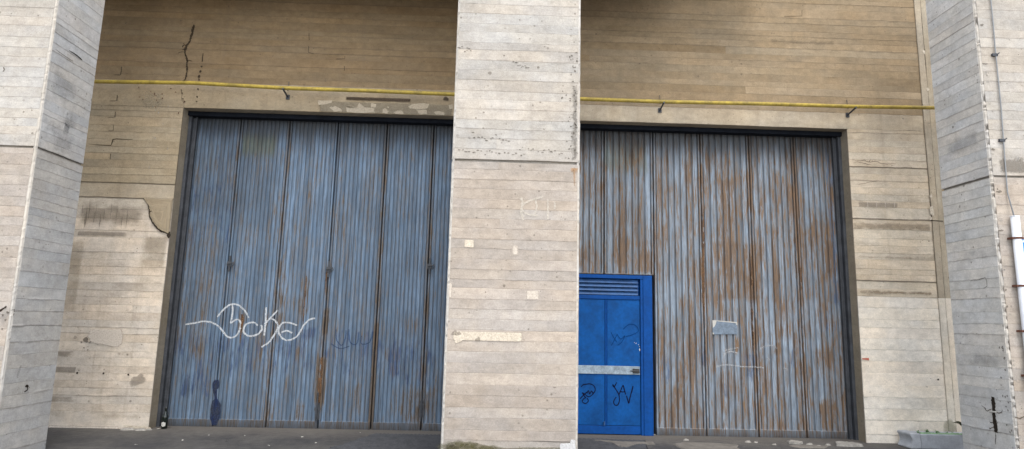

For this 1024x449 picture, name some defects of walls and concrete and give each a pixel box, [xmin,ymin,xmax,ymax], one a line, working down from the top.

crack [179,24,203,103]
peeling [318,100,453,115]
crack [981,397,1024,444]